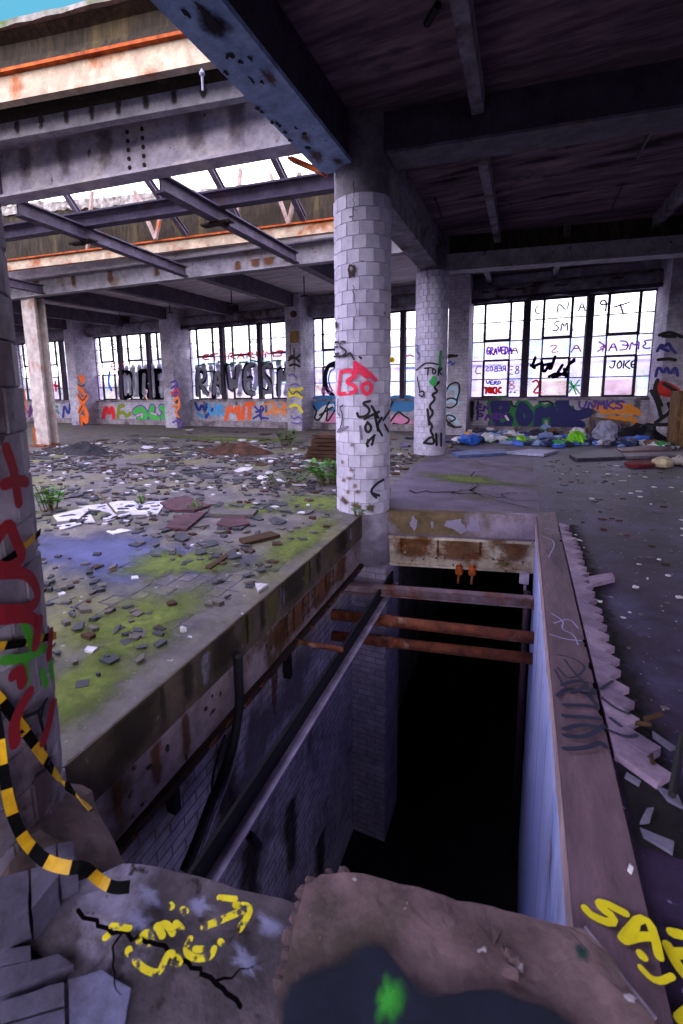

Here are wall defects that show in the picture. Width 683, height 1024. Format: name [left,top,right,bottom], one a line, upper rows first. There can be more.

corrosion [0,30,187,77]
corrosion [7,247,103,262]
corrosion [131,231,231,245]
corrosion [235,257,288,270]
corrosion [257,217,334,229]
crack [409,454,543,508]
corrosion [400,538,485,560]
corrosion [498,543,529,562]
spalling [121,593,352,874]
spalling [398,517,573,927]
spalling [219,662,353,997]
crack [76,908,264,1009]